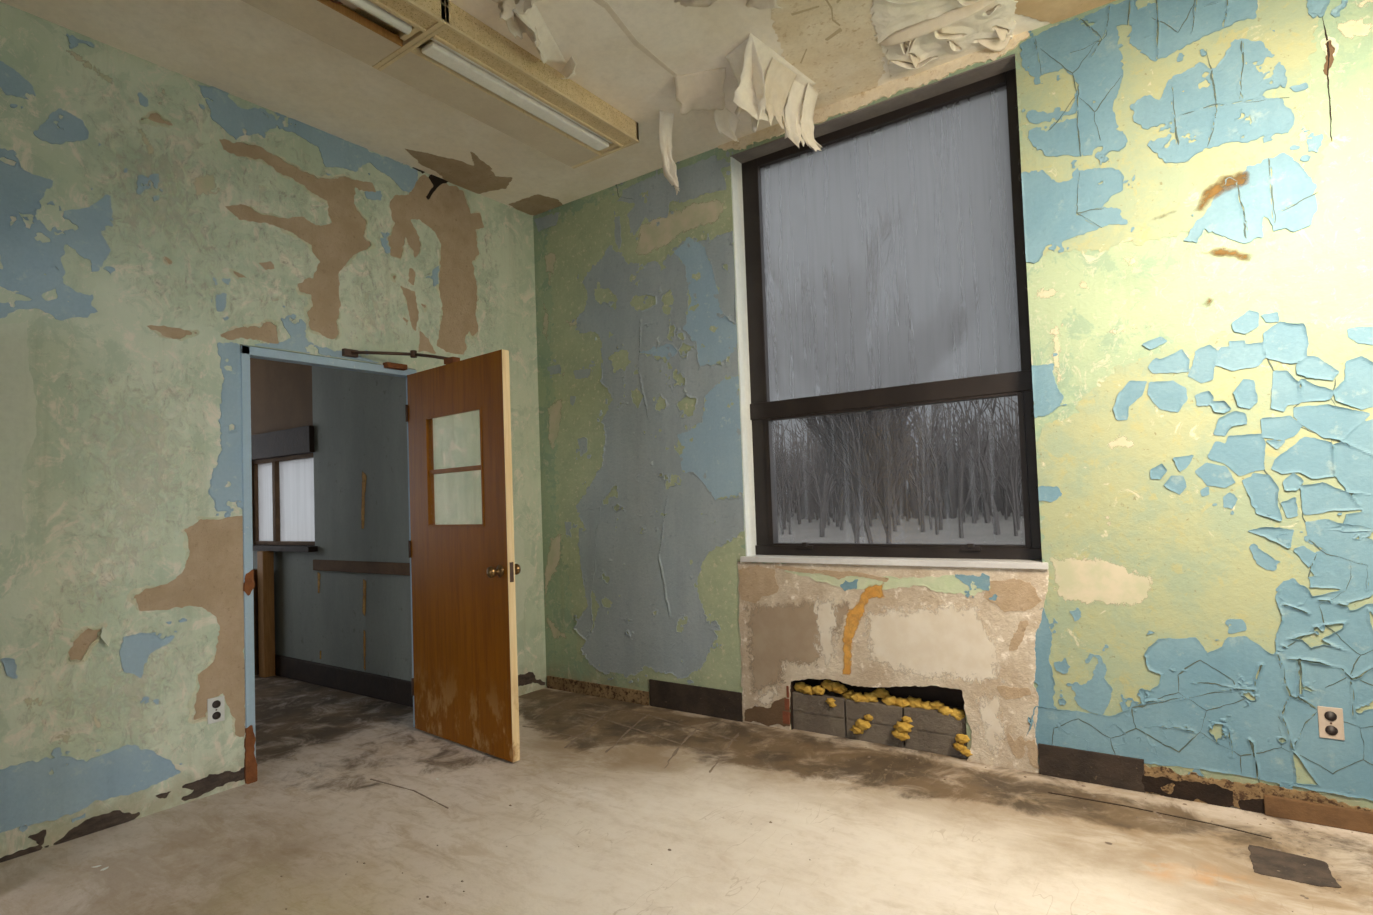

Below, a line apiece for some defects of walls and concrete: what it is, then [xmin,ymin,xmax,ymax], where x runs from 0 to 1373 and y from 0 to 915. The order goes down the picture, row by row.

peeling [0,61,36,108]
peeling [0,148,115,321]
peeling [33,108,101,146]
crack [1035,0,1289,228]
crack [1237,158,1318,238]
flaking render [66,85,512,739]
peeling [509,0,1373,812]
peeling [1,658,18,679]
crack [1052,469,1373,783]
crack [1048,792,1272,839]